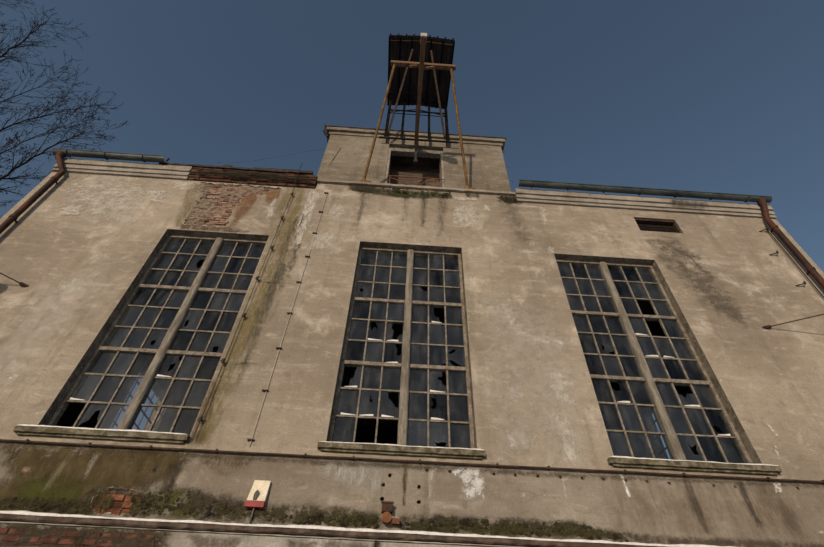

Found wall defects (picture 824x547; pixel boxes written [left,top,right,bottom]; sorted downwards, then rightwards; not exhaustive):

spalling [183,182,283,228]
leakage [0,444,189,515]
spalling [90,486,159,516]
leakage [0,522,169,547]